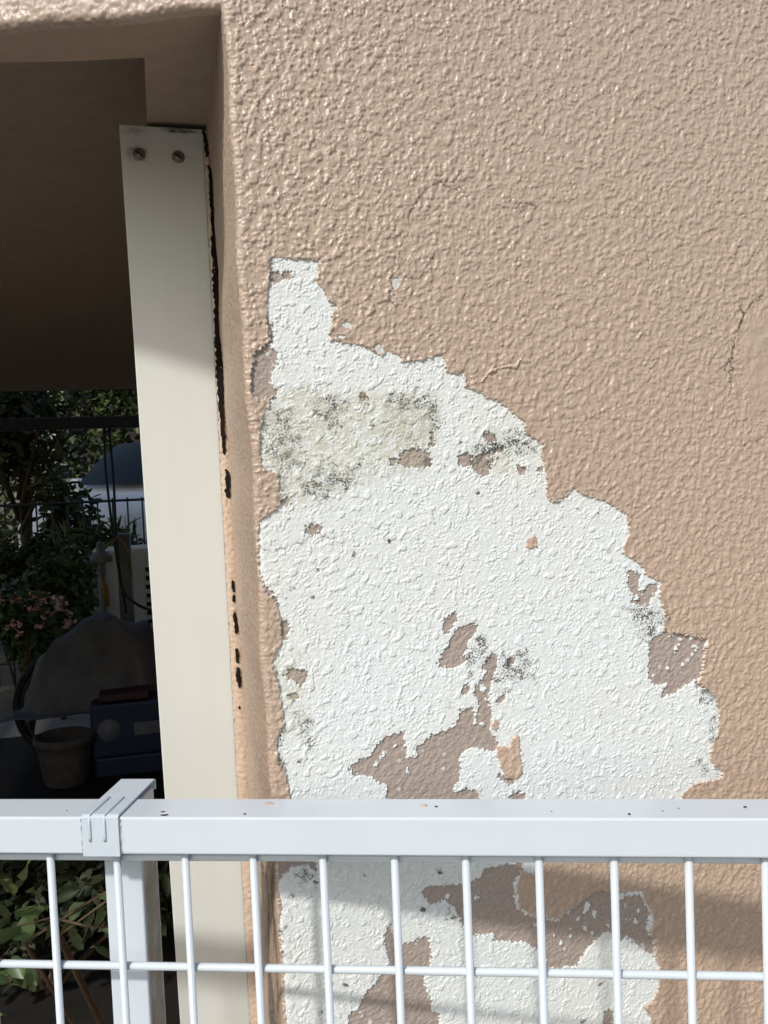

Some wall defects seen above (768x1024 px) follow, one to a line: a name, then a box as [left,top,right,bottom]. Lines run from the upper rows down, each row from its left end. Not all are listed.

crack [727,294,764,393]
leakage [259,407,303,478]
leakage [314,395,347,429]
leakage [302,464,361,497]
leakage [385,386,439,433]
leakage [470,428,536,468]
peeling [251,257,723,799]
peeling [278,861,659,1024]